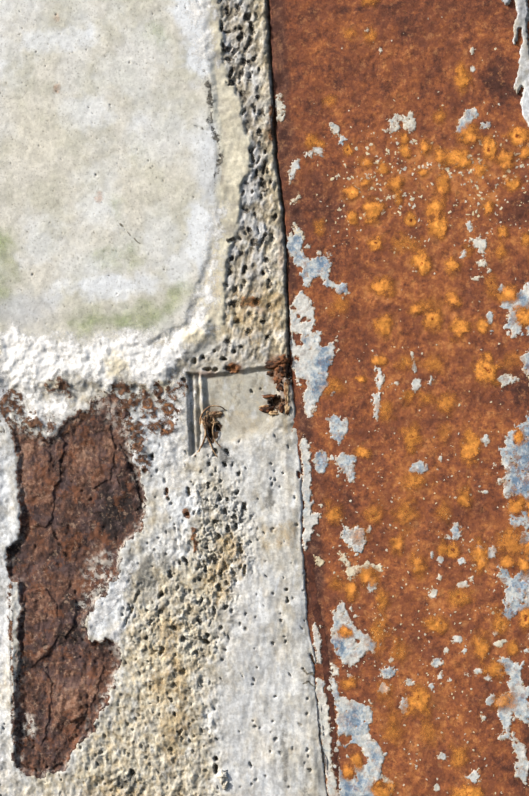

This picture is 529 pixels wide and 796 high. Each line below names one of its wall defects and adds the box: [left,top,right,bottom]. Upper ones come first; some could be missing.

water stain [185,0,265,117]
water stain [241,128,273,199]
corrosion [398,122,529,240]
water stain [0,206,278,487]
peeling [285,222,350,418]
corrosion [409,291,490,340]
corrosion [0,376,189,473]
water stain [199,491,247,593]
peeling [299,414,357,567]
corrosion [470,493,529,575]
peeling [312,600,395,796]
peeling [485,632,529,785]